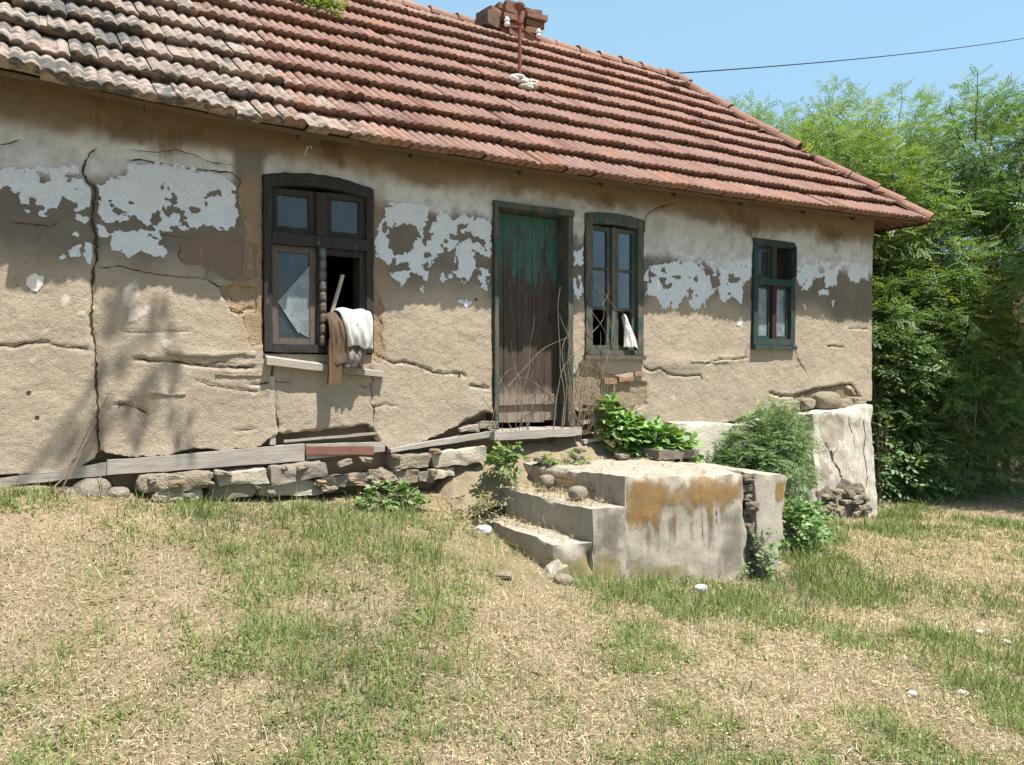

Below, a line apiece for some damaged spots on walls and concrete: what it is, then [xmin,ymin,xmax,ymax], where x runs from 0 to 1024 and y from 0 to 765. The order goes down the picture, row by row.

crack [1,148,246,454]
peeling [0,161,262,345]
peeling [374,201,492,309]
peeling [644,256,752,310]
peeling [796,259,869,318]
crack [593,347,868,485]